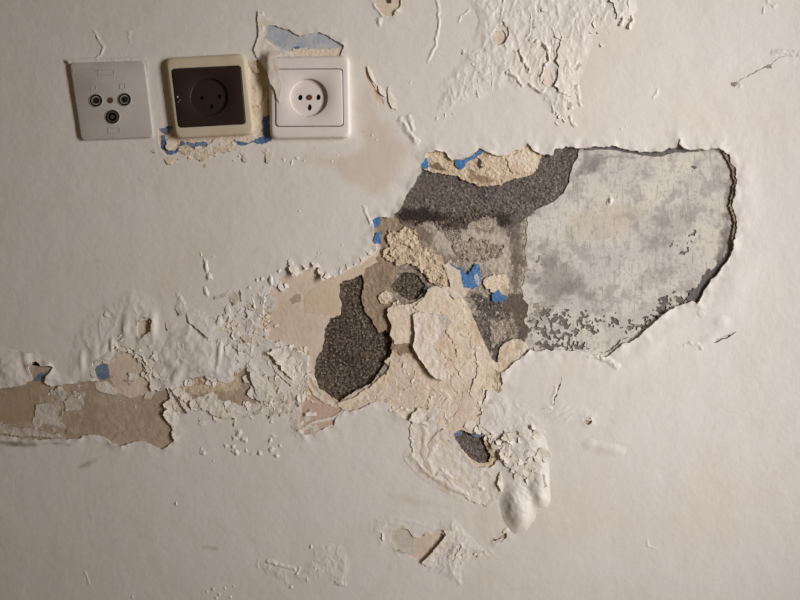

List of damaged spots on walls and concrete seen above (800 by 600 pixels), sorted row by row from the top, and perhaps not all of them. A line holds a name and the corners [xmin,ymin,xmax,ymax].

peeling [372,0,402,27]
peeling [151,11,344,167]
peeling [366,66,421,147]
peeling [435,0,637,128]
crack [731,48,800,89]
flaking render [0,146,737,507]
peeling [372,515,509,589]